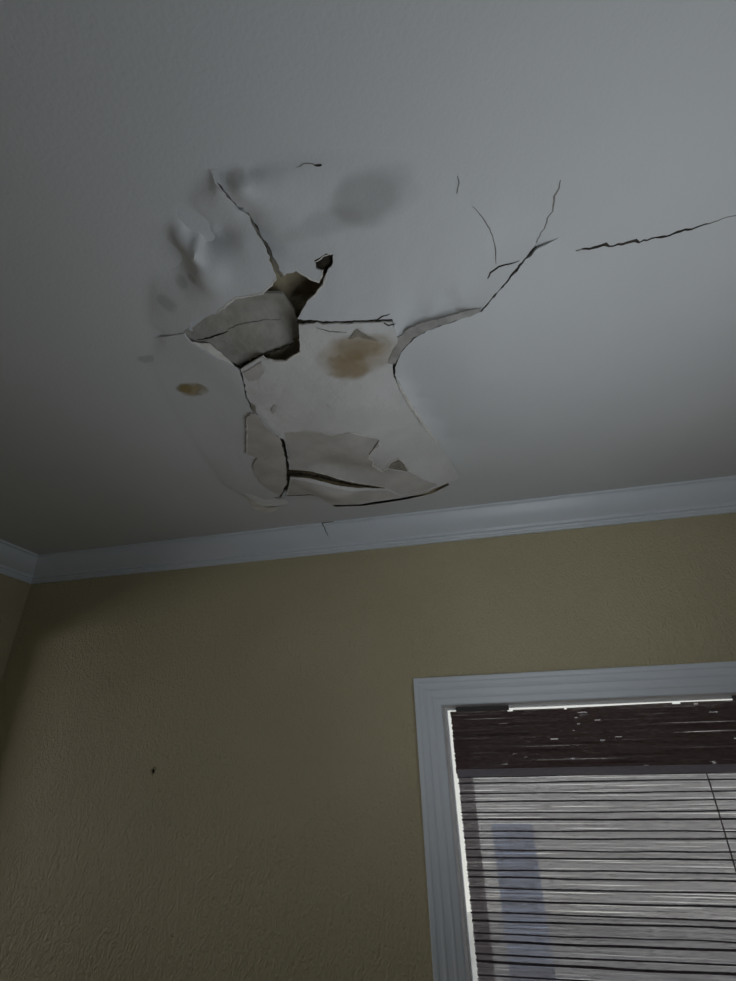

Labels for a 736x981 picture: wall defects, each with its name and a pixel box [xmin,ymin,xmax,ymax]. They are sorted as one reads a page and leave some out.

crack [224,192,282,277]
crack [457,176,561,311]
crack [576,215,736,251]
spalling [183,219,393,419]
crack [297,314,417,376]
spalling [281,438,384,488]
spalling [388,460,408,472]